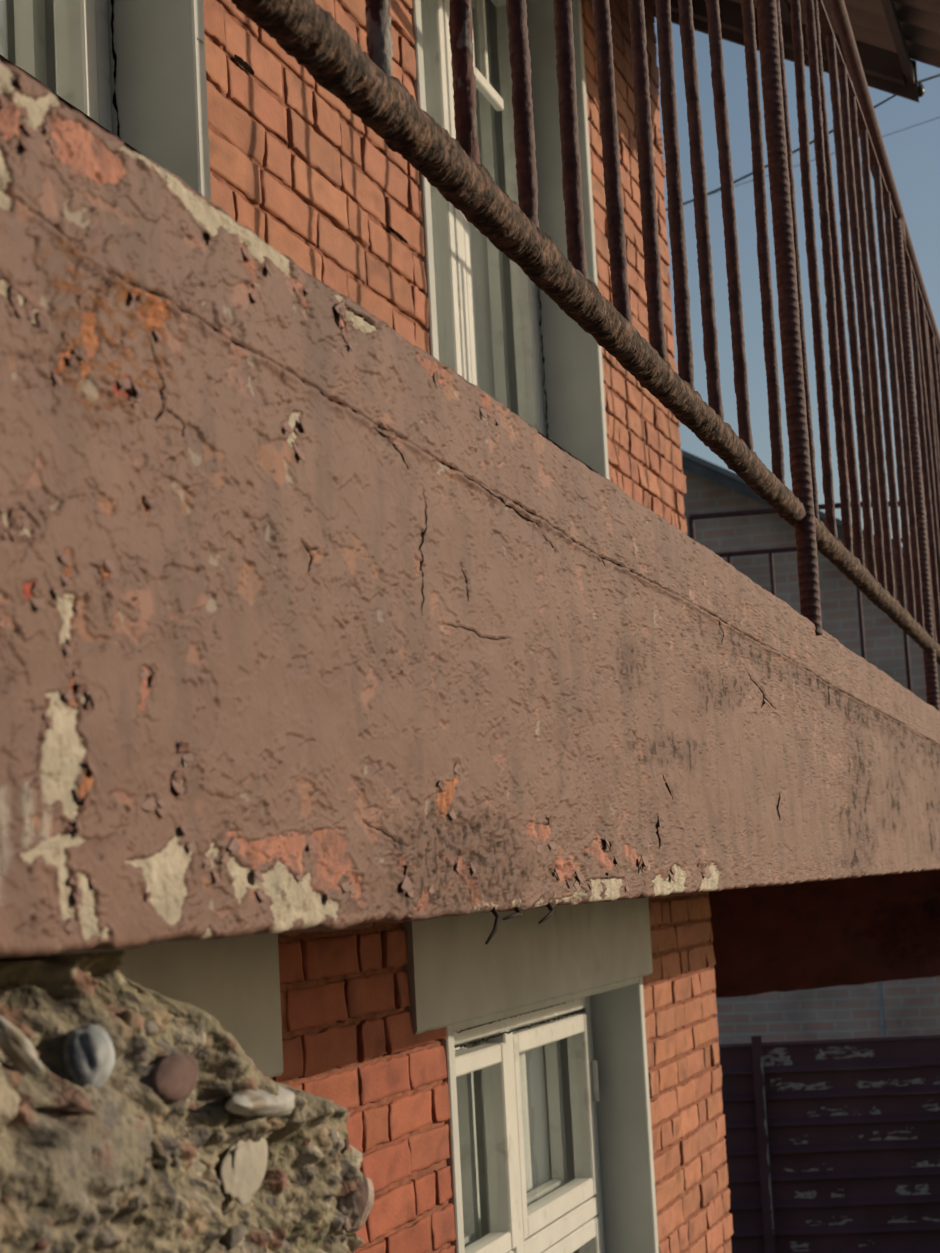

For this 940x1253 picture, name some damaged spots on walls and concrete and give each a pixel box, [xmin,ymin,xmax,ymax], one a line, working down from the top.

peeling [0,63,312,321]
peeling [0,279,101,388]
peeling [130,287,171,343]
peeling [334,294,377,351]
crack [108,273,940,746]
peeling [20,548,109,941]
peeling [435,762,462,821]
peeling [126,793,364,933]
peeling [396,854,435,916]
spalling [448,814,720,945]
peeling [815,1046,875,1060]
peeling [761,1047,833,1230]